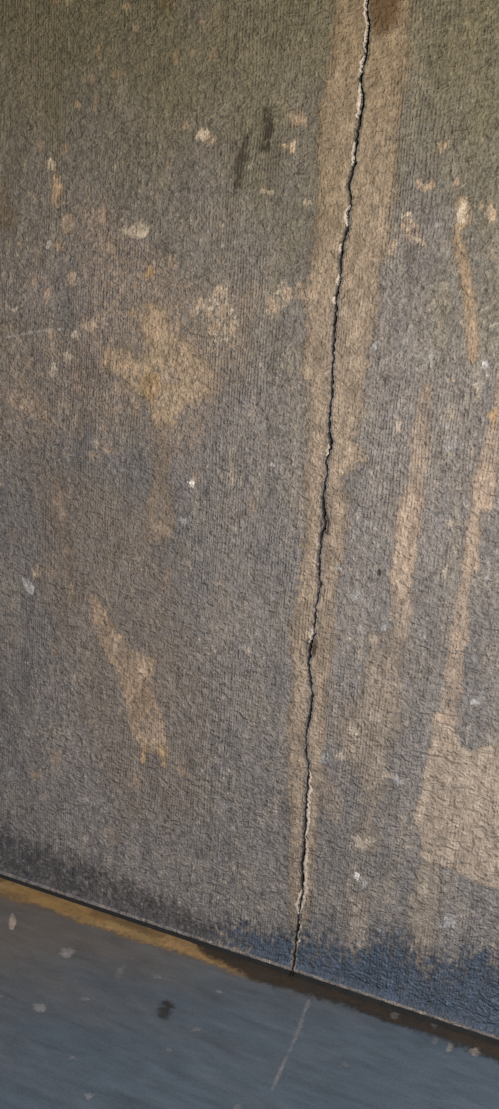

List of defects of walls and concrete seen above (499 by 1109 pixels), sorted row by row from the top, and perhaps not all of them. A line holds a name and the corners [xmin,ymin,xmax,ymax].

peeling [0,140,251,453]
peeling [266,281,302,314]
peeling [22,471,206,818]
crack [290,0,371,978]
peeling [413,712,499,890]